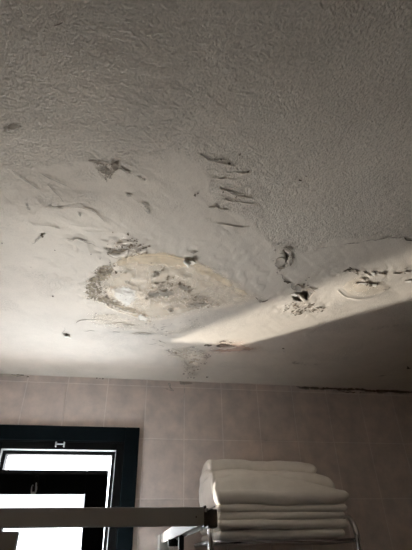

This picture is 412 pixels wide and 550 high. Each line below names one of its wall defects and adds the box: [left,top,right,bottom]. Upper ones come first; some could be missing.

spalling [88,159,145,182]
peeling [106,233,150,263]
leakage [86,265,147,321]
peeling [145,269,221,312]
peeling [273,242,325,316]
crack [296,385,412,393]